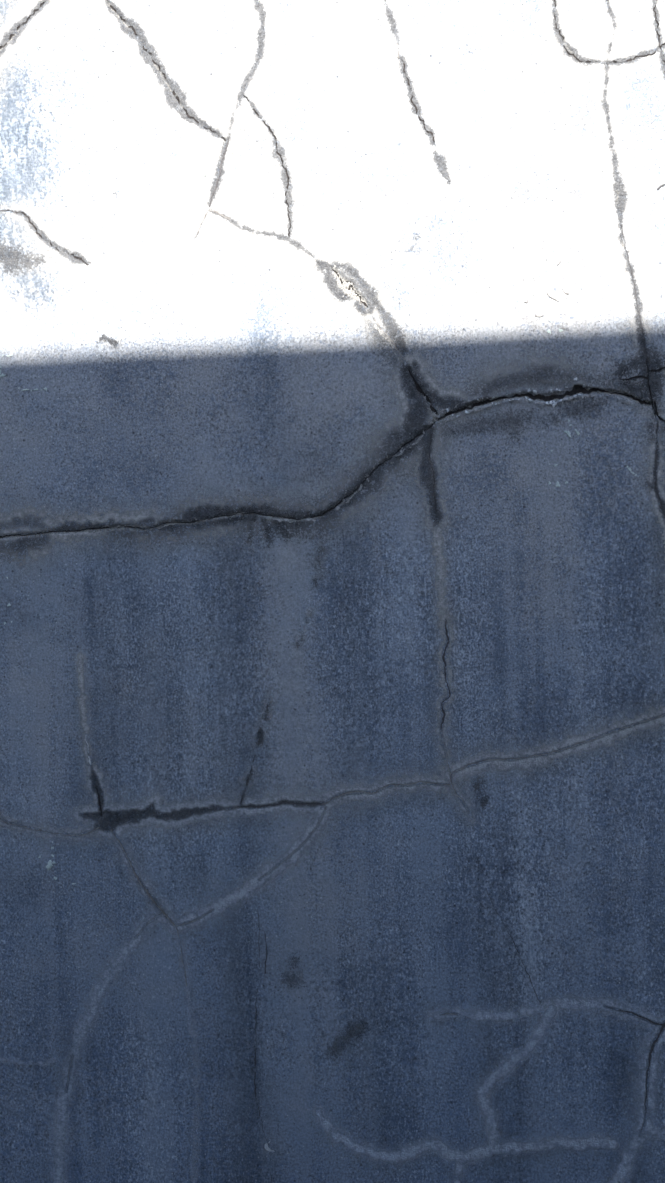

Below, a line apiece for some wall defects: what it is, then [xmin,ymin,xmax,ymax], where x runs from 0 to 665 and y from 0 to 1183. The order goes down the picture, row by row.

crack [0,0,665,570]
water stain [414,420,448,621]
crack [0,613,665,1183]